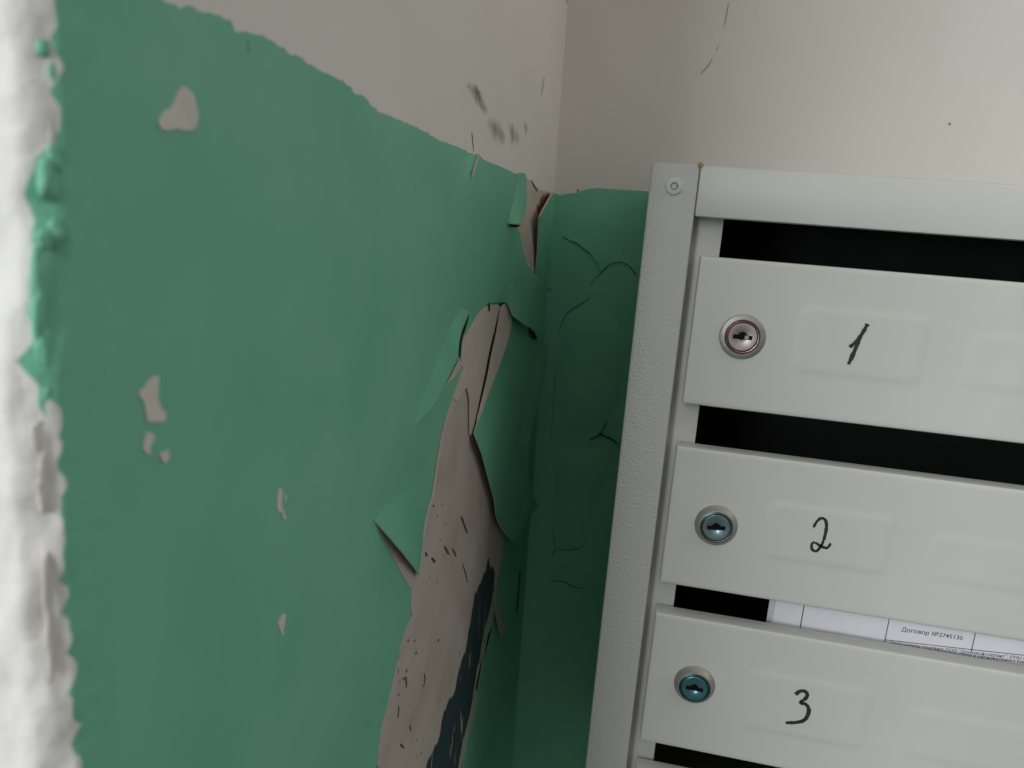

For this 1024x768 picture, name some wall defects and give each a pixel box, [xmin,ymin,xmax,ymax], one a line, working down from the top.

flaking render [35,38,57,81]
peeling [157,86,199,131]
flaking render [36,118,64,202]
flaking render [27,218,65,369]
flaking render [31,385,51,514]
peeling [138,375,170,463]
peeling [276,488,287,520]
peeling [377,154,558,768]
flaking render [42,552,58,684]